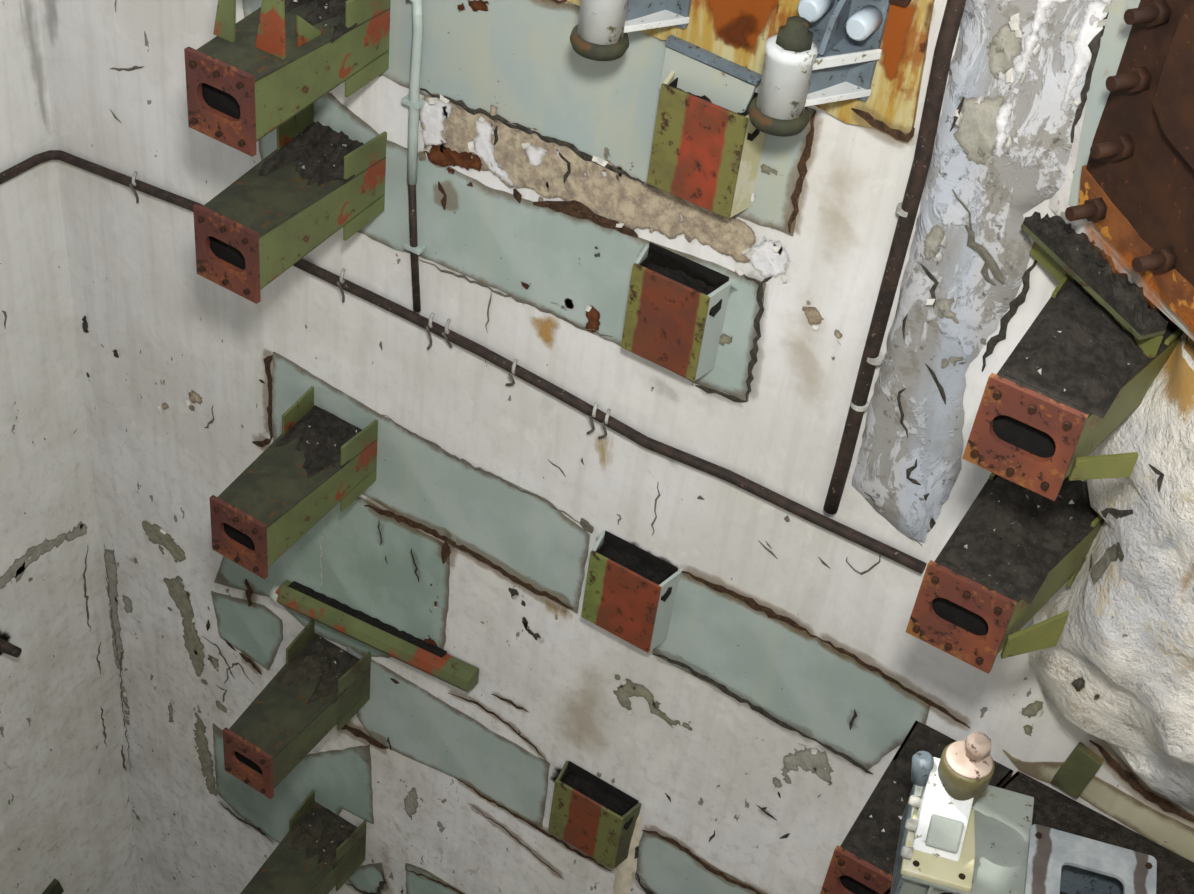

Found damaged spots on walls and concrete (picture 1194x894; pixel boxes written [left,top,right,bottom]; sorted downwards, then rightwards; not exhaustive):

corrosion [709,0,778,53]
corrosion [880,3,933,80]
peeling [951,0,1068,173]
peeling [1060,0,1112,116]
spalling [419,88,791,283]
spalling [551,298,600,333]
peeling [0,522,87,589]
peeling [140,520,186,562]
peeling [104,549,133,725]
peeling [163,576,220,689]
peeling [613,674,692,731]
peeling [772,743,834,788]